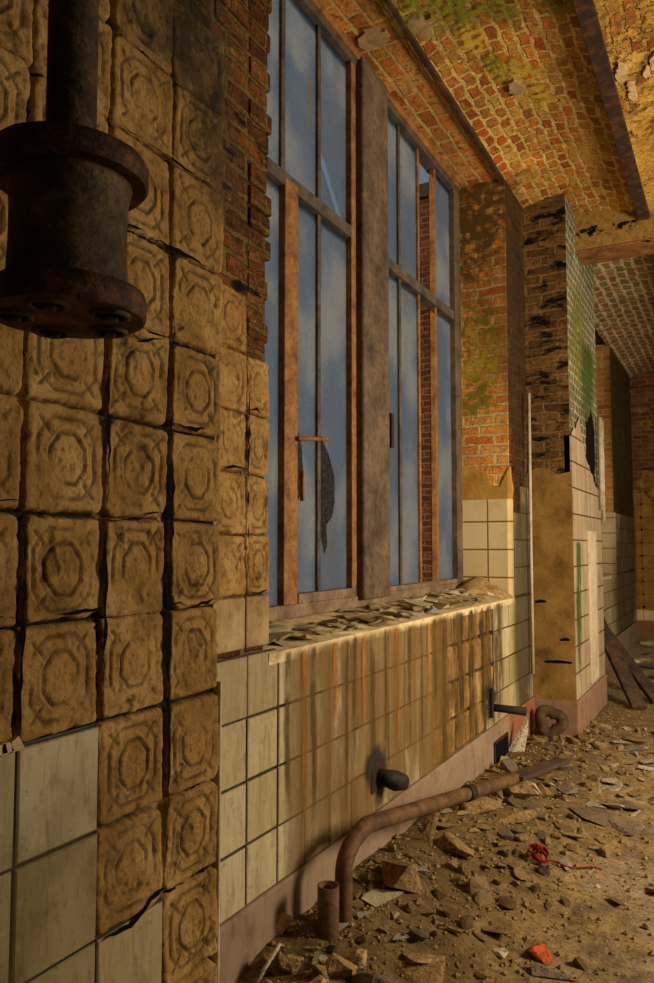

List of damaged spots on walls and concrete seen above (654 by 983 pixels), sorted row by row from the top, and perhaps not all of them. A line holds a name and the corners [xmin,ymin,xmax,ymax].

damp [460,24,485,53]
damp [486,59,551,106]
peeling [615,53,654,102]
crack [0,499,27,734]
crack [61,308,216,941]
crack [226,366,267,594]
spalling [0,0,496,983]
spalling [633,461,654,611]